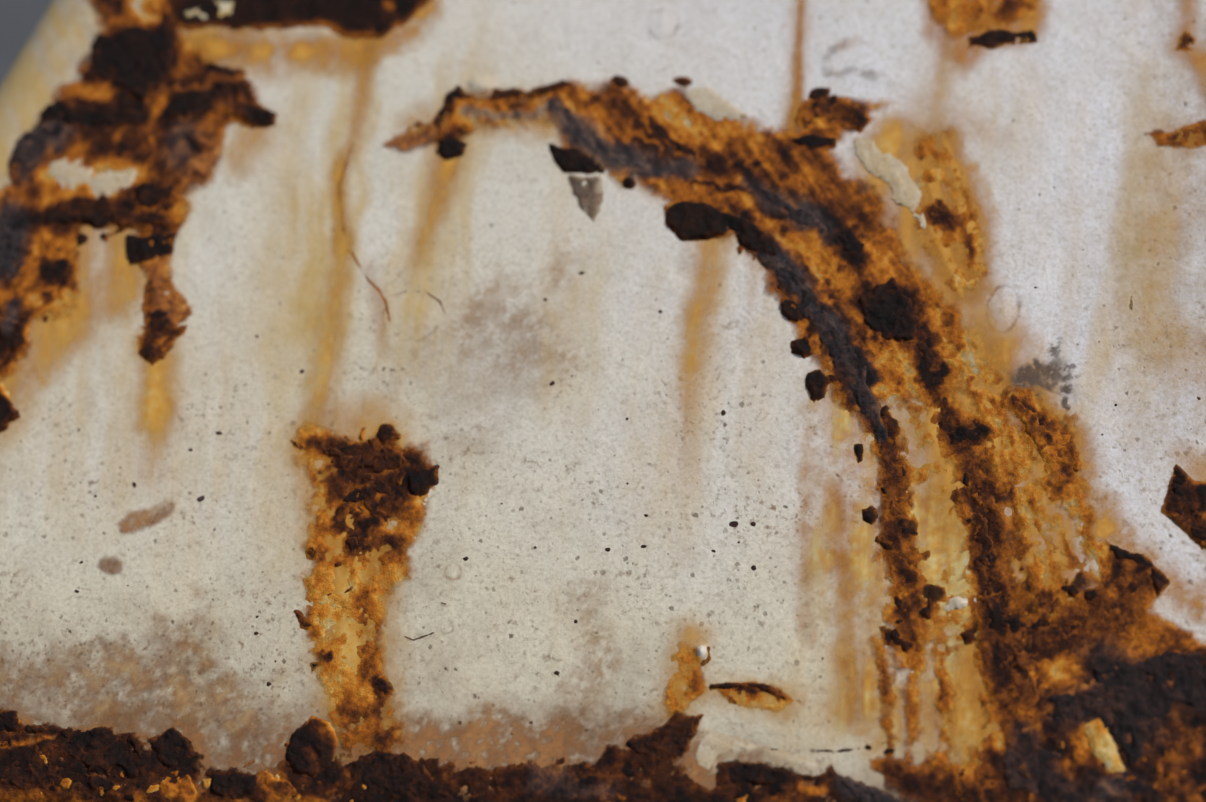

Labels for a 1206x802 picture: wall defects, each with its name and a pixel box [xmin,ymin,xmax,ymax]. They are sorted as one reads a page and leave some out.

rust [0,0,437,448]
rust [0,409,902,802]
rust [384,52,1206,802]
rust [928,0,1045,66]